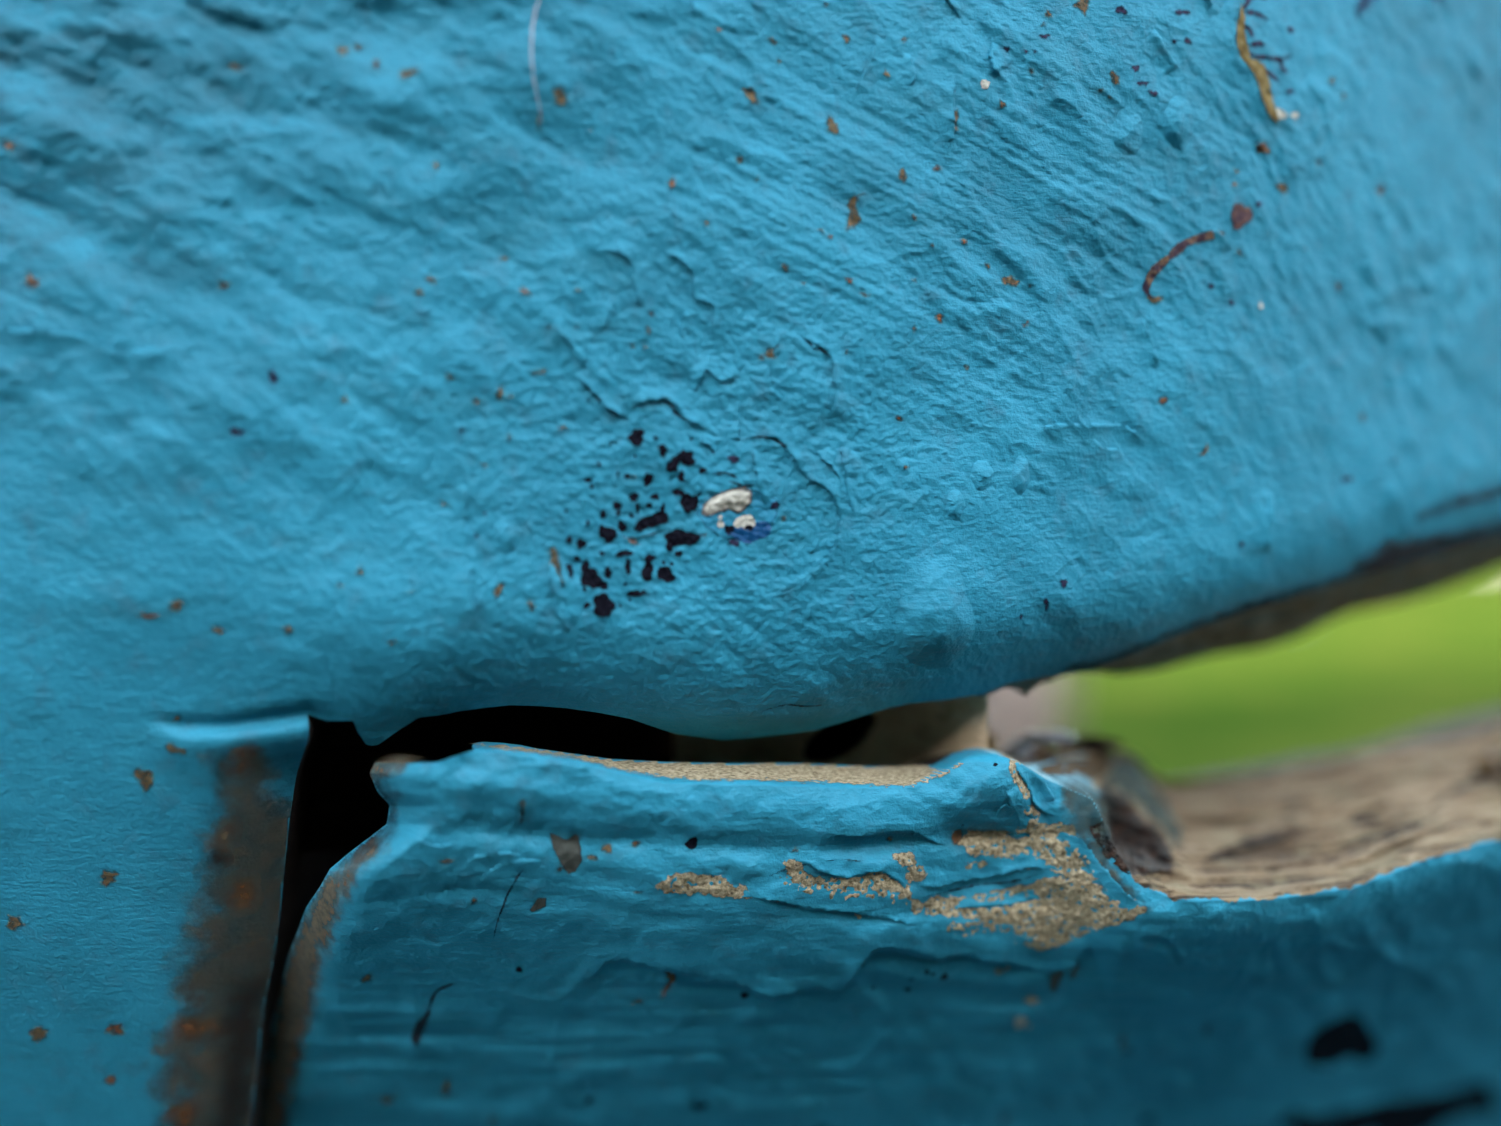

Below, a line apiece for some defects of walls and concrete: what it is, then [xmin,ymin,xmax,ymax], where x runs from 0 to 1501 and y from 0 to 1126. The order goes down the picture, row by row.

rust [1256,143,1271,154]
peeling [548,233,867,633]
spalling [475,743,963,788]
peeling [404,833,582,891]
peeling [571,750,1213,1001]
rust [153,747,405,1126]
rust [106,1024,123,1035]